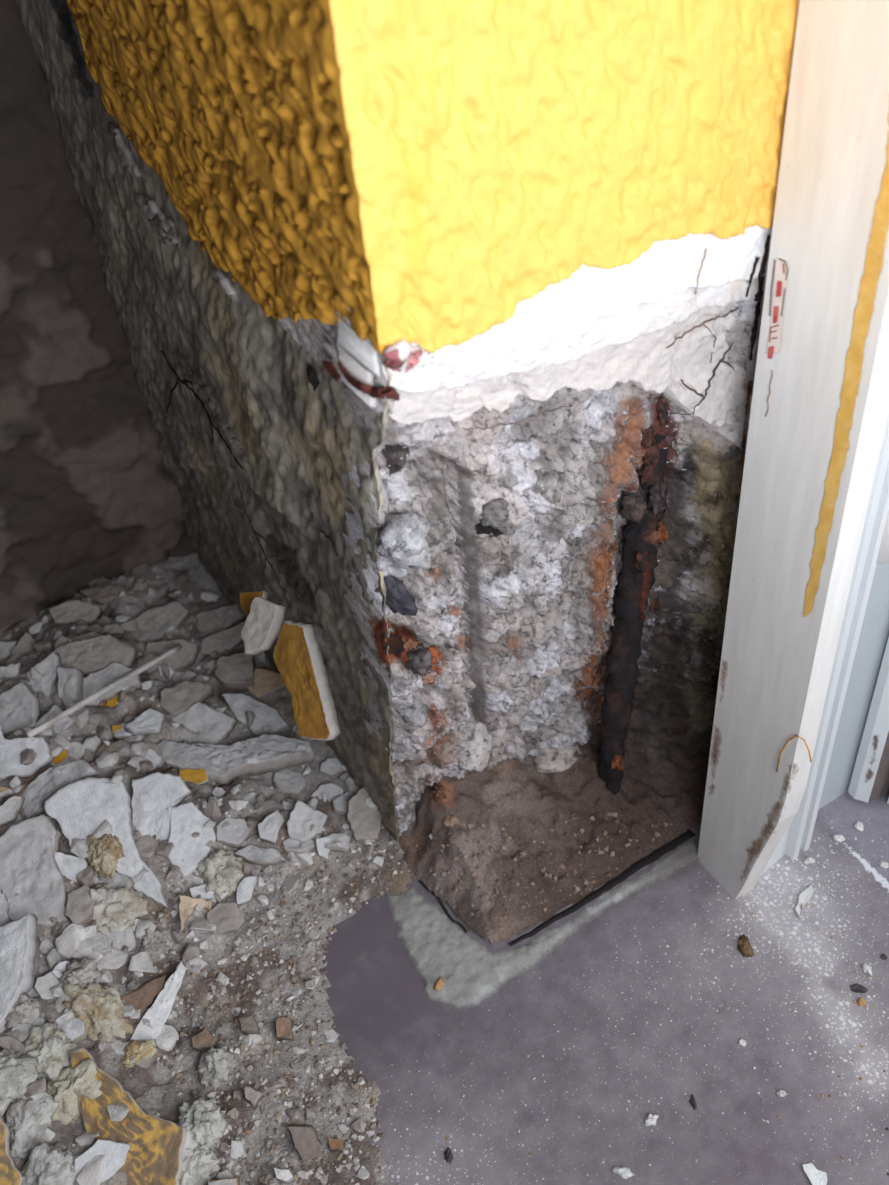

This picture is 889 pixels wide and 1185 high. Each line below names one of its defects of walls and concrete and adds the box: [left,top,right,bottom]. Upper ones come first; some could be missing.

flaking render [108,124,142,178]
flaking render [211,268,240,303]
crack [666,234,773,417]
crack [161,350,291,608]
spalling [277,225,772,840]
corrosion [574,396,678,717]
corrosion [368,619,444,685]
corrosion [610,754,625,771]